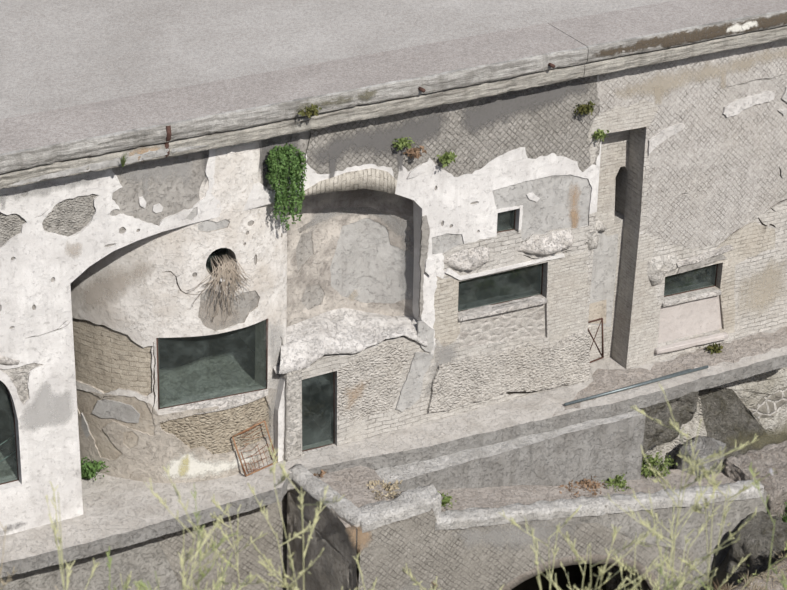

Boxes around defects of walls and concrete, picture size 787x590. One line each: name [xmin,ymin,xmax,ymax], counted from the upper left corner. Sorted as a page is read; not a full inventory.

peeling [722,86,787,117]
peeling [648,123,686,156]
peeling [407,165,428,179]
flaking render [9,145,229,236]
flaking render [0,212,26,247]
peeling [676,244,734,274]
flaking render [72,318,270,460]